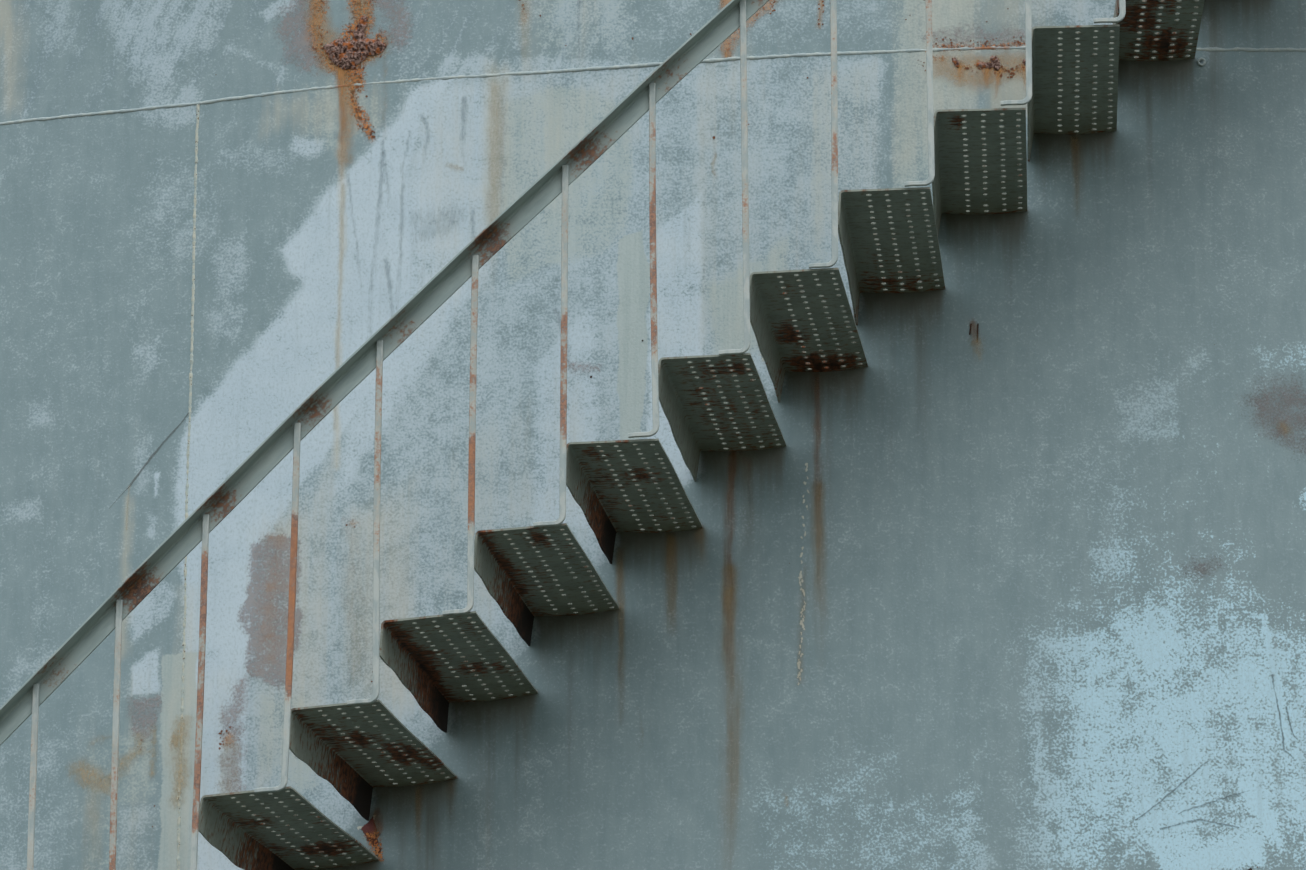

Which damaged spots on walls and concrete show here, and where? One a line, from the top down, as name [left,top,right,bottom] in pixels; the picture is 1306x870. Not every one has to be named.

rust [280,0,412,139]
rust [721,0,777,58]
rust [923,21,1026,82]